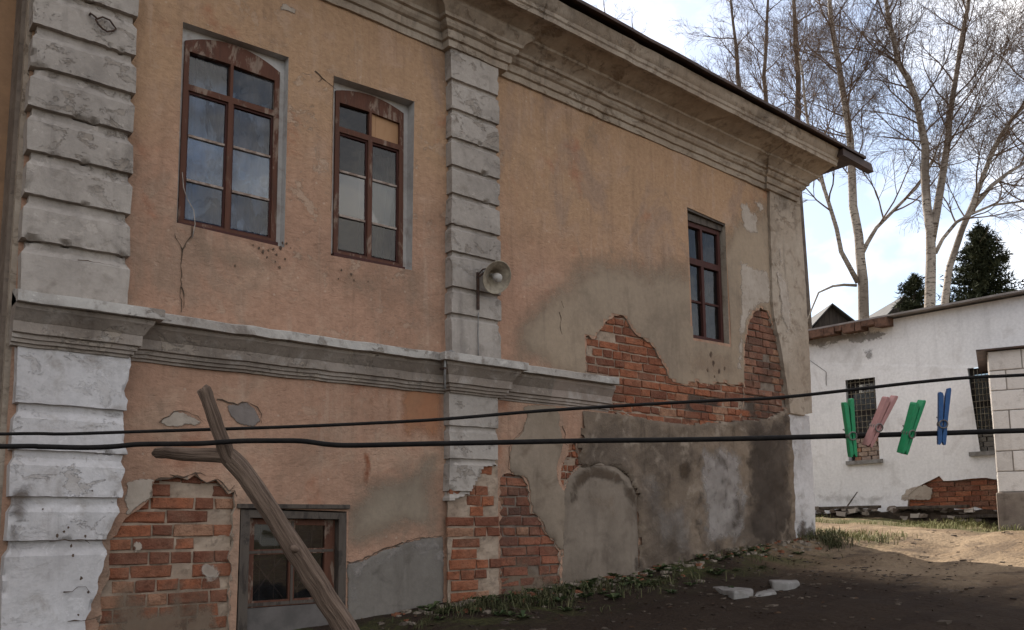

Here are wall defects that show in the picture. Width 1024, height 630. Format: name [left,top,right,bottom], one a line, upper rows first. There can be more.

peeling [741,203,763,232]
crack [175,227,193,312]
flaking render [585,264,787,425]
peeling [159,410,201,427]
peeling [217,399,262,426]
flaking render [446,405,581,603]
water stain [733,401,814,543]
flaking render [901,476,998,510]
flaking render [80,475,236,630]